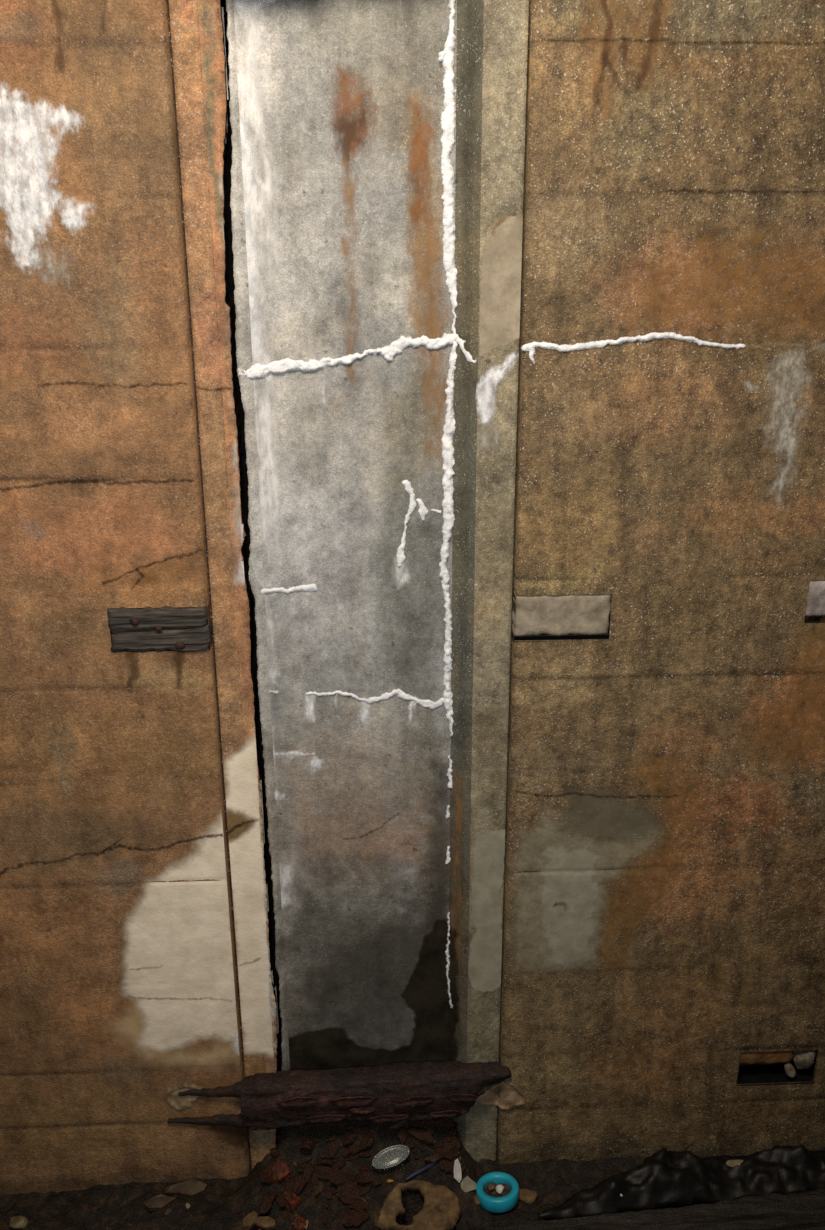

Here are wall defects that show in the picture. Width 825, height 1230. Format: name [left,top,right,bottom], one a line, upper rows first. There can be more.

damp [0,88,86,280]
rust [335,73,367,164]
rust [409,108,441,339]
damp [396,0,457,736]
crack [521,332,745,364]
damp [769,352,808,502]
crack [0,0,476,1073]
peeling [116,736,279,1065]
peeling [538,845,600,966]
damp [288,913,459,1070]
crack [267,1128,278,1153]